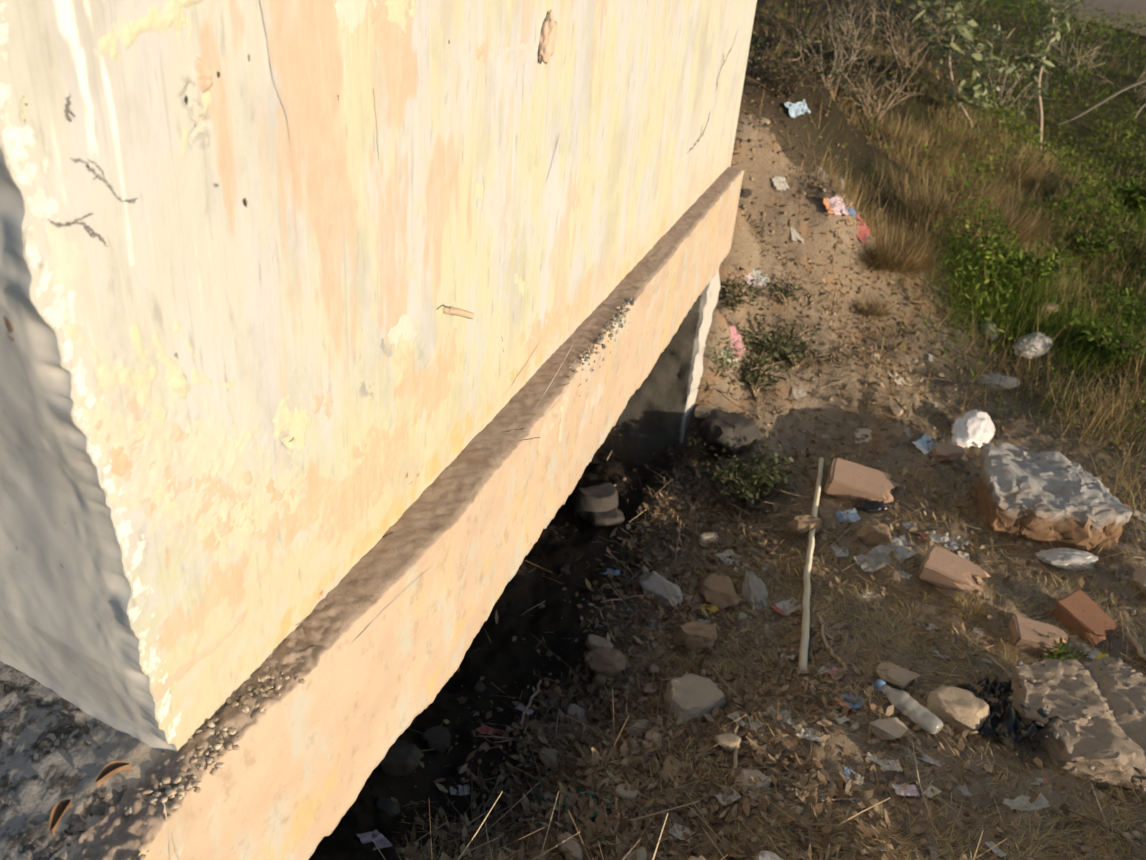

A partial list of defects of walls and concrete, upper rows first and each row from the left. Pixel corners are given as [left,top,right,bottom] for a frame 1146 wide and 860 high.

crack [259,0,290,140]
crack [687,113,710,154]
peeling [0,3,311,810]
spalling [548,297,639,444]